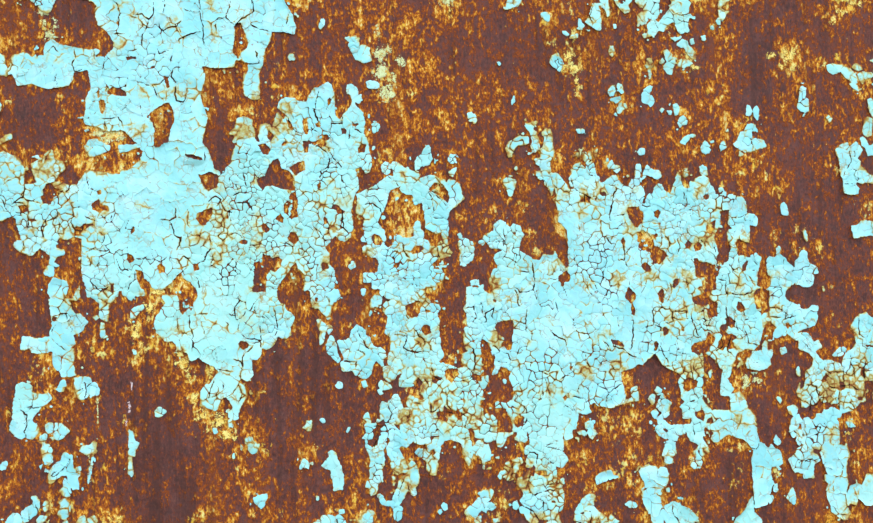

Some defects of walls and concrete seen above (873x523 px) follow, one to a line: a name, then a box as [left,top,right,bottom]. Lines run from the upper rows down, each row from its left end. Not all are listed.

crack [116,0,205,46]
crack [225,0,268,31]
crack [171,66,187,103]
corrosion [371,25,406,103]
corrosion [560,48,581,97]
peeling [562,0,767,157]
peeling [835,98,873,195]
crack [161,209,211,280]
peeling [20,278,100,400]
corrosion [128,284,177,360]
peeling [9,381,98,523]
corrosion [191,393,238,441]